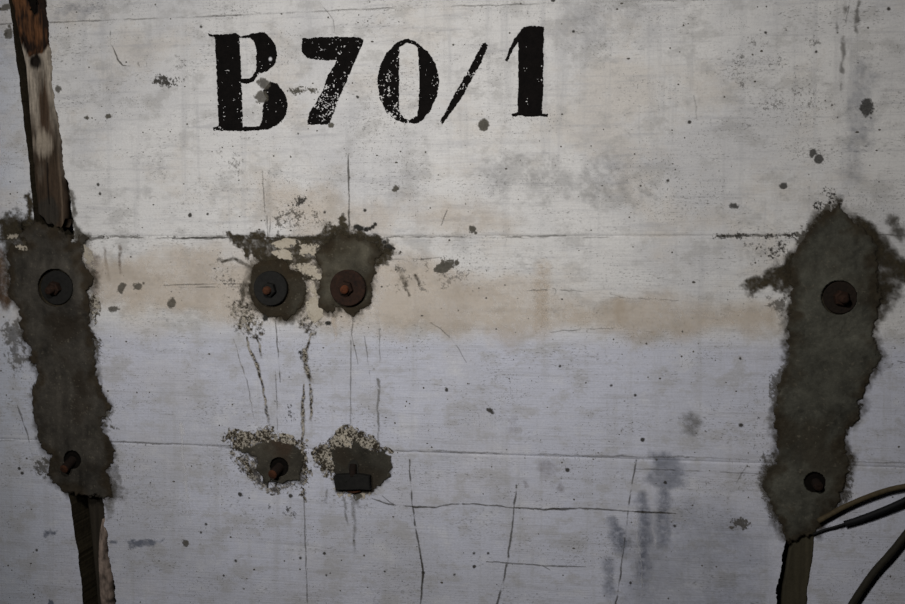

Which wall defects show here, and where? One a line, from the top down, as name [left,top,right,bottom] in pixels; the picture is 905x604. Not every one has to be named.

peeling [258,190,342,325]
peeling [713,232,796,265]
spalling [219,404,409,515]
crack [377,460,451,599]
crack [478,465,665,604]